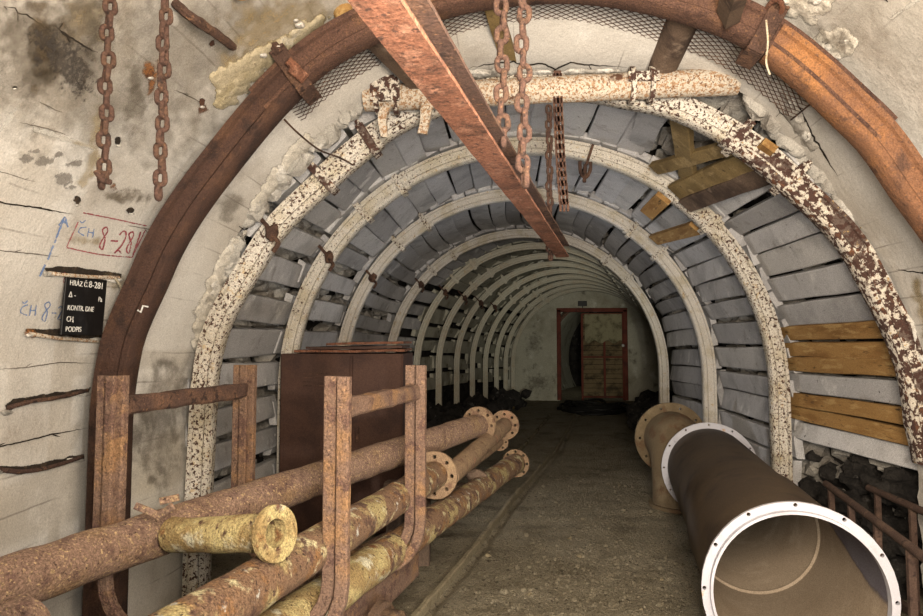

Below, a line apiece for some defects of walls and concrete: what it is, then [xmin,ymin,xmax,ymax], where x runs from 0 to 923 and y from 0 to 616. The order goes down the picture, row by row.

crack [4,6,98,53]
leakage [28,18,97,99]
crack [0,201,70,214]
corrosion [294,341,412,353]